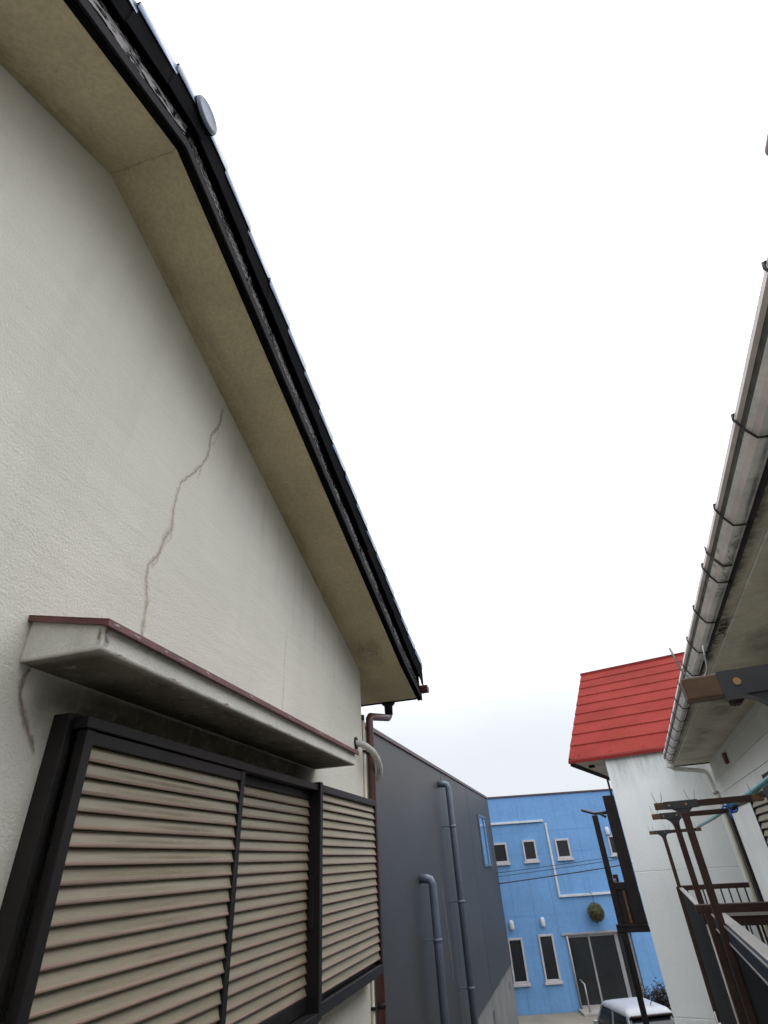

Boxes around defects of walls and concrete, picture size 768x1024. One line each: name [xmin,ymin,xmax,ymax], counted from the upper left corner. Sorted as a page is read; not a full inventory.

crack [20,670,33,749]